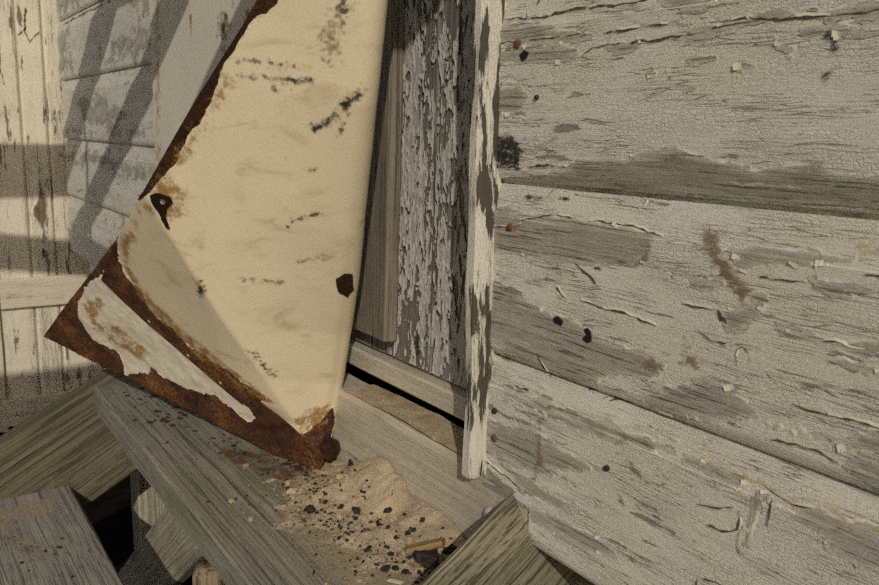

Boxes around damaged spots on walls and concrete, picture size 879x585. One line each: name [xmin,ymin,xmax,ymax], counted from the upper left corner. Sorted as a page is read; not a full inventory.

crack [500,0,879,53]
corrosion [138,0,278,229]
peeling [390,0,474,389]
peeling [501,145,879,208]
peeling [494,204,655,269]
corrosion [84,297,146,361]
corrosion [101,224,273,425]
peeling [490,282,879,491]
corrosion [295,405,335,470]
peeling [486,386,770,565]
crack [697,504,743,553]
crack [765,486,815,527]